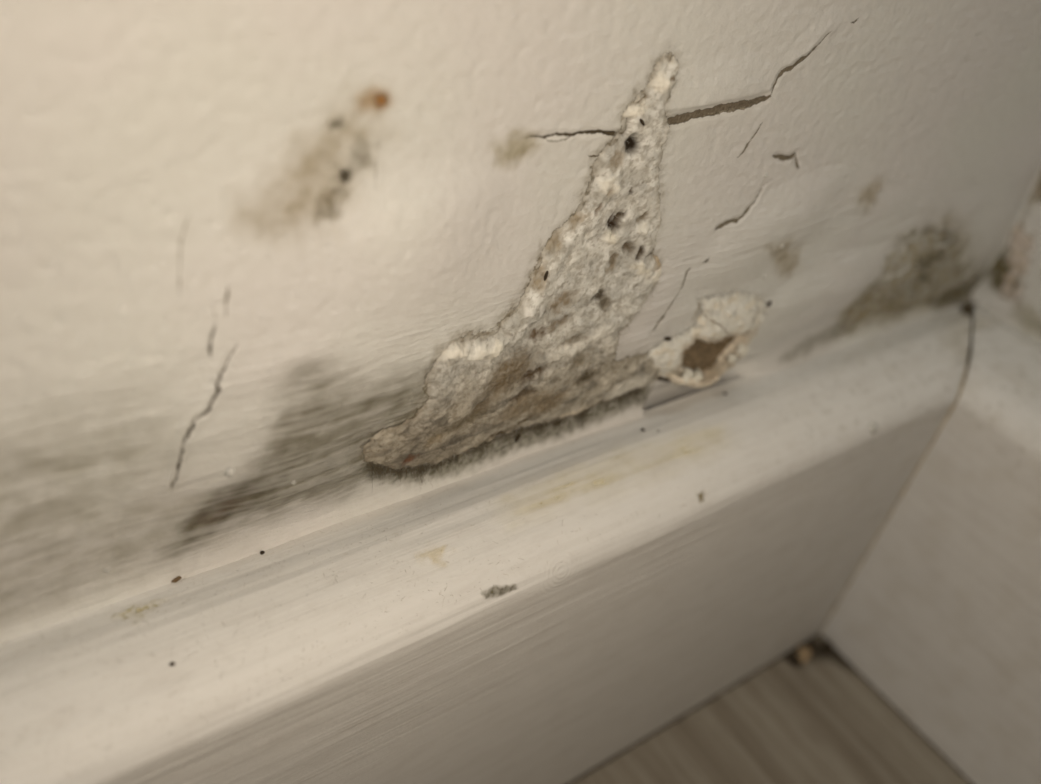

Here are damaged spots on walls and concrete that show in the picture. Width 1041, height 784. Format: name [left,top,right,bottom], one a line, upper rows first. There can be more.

crack [667,19,858,157]
crack [773,152,799,168]
crack [715,182,768,230]
spalling [360,7,849,487]
crack [649,258,709,335]
water stain [920,233,1017,306]
crack [171,289,237,492]
water stain [186,489,259,540]